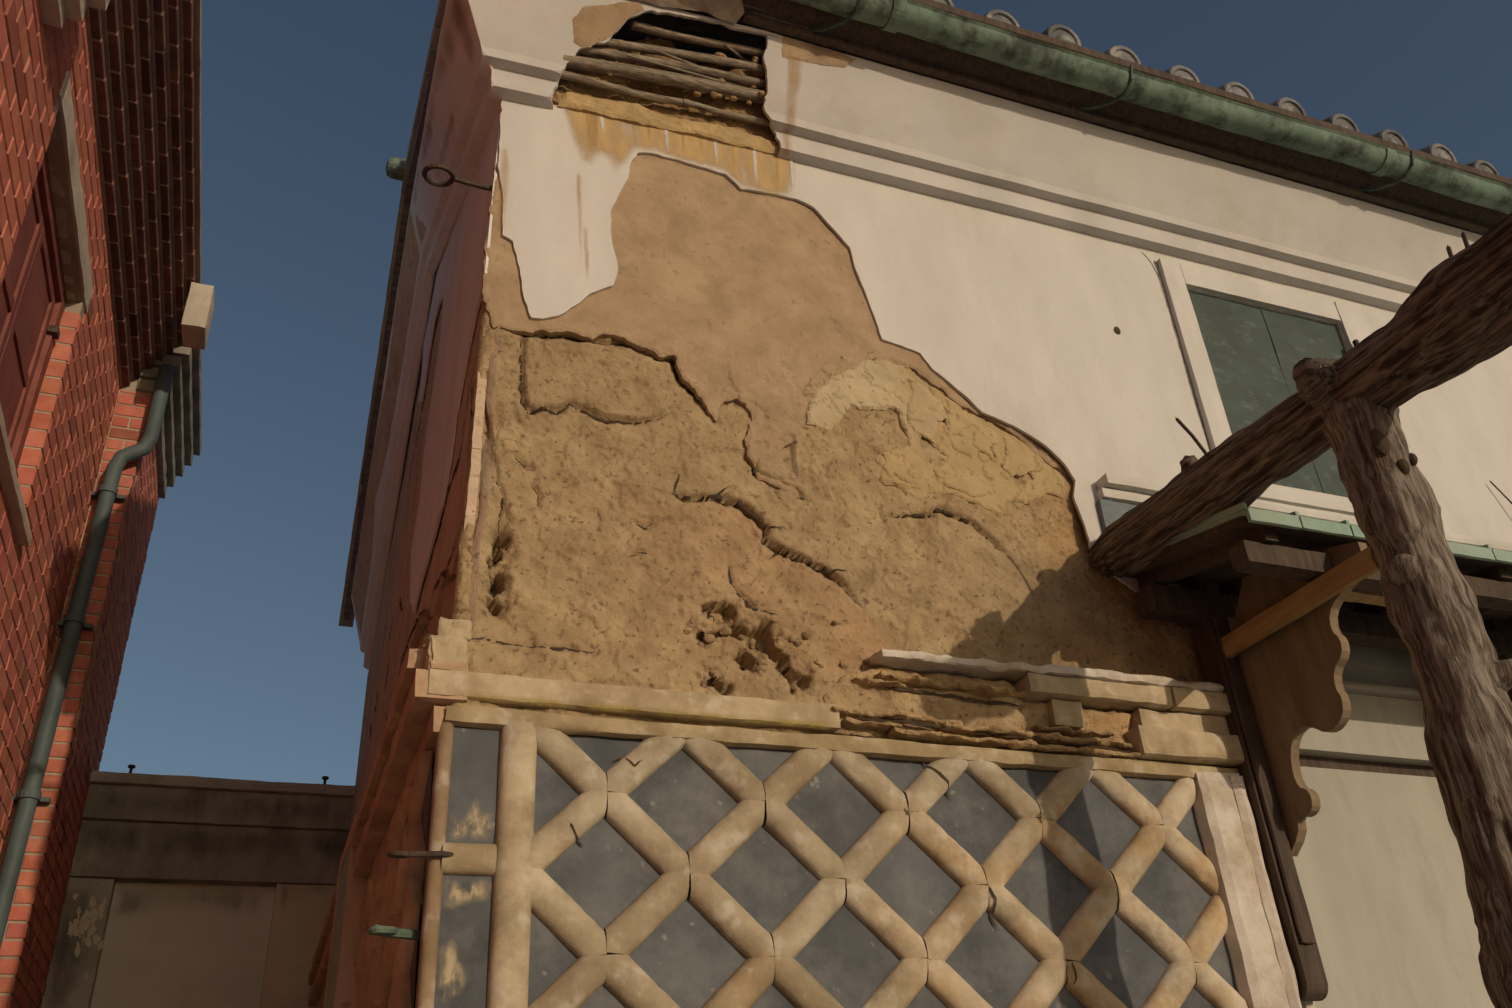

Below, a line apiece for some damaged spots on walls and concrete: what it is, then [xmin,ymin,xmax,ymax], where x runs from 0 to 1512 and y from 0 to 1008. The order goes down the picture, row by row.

spalling [552,2,856,155]
crack [370,334,700,739]
crack [627,468,862,606]
crack [728,567,777,615]
flaking render [350,154,1206,829]
crack [888,508,1000,550]
peeling [67,880,107,957]